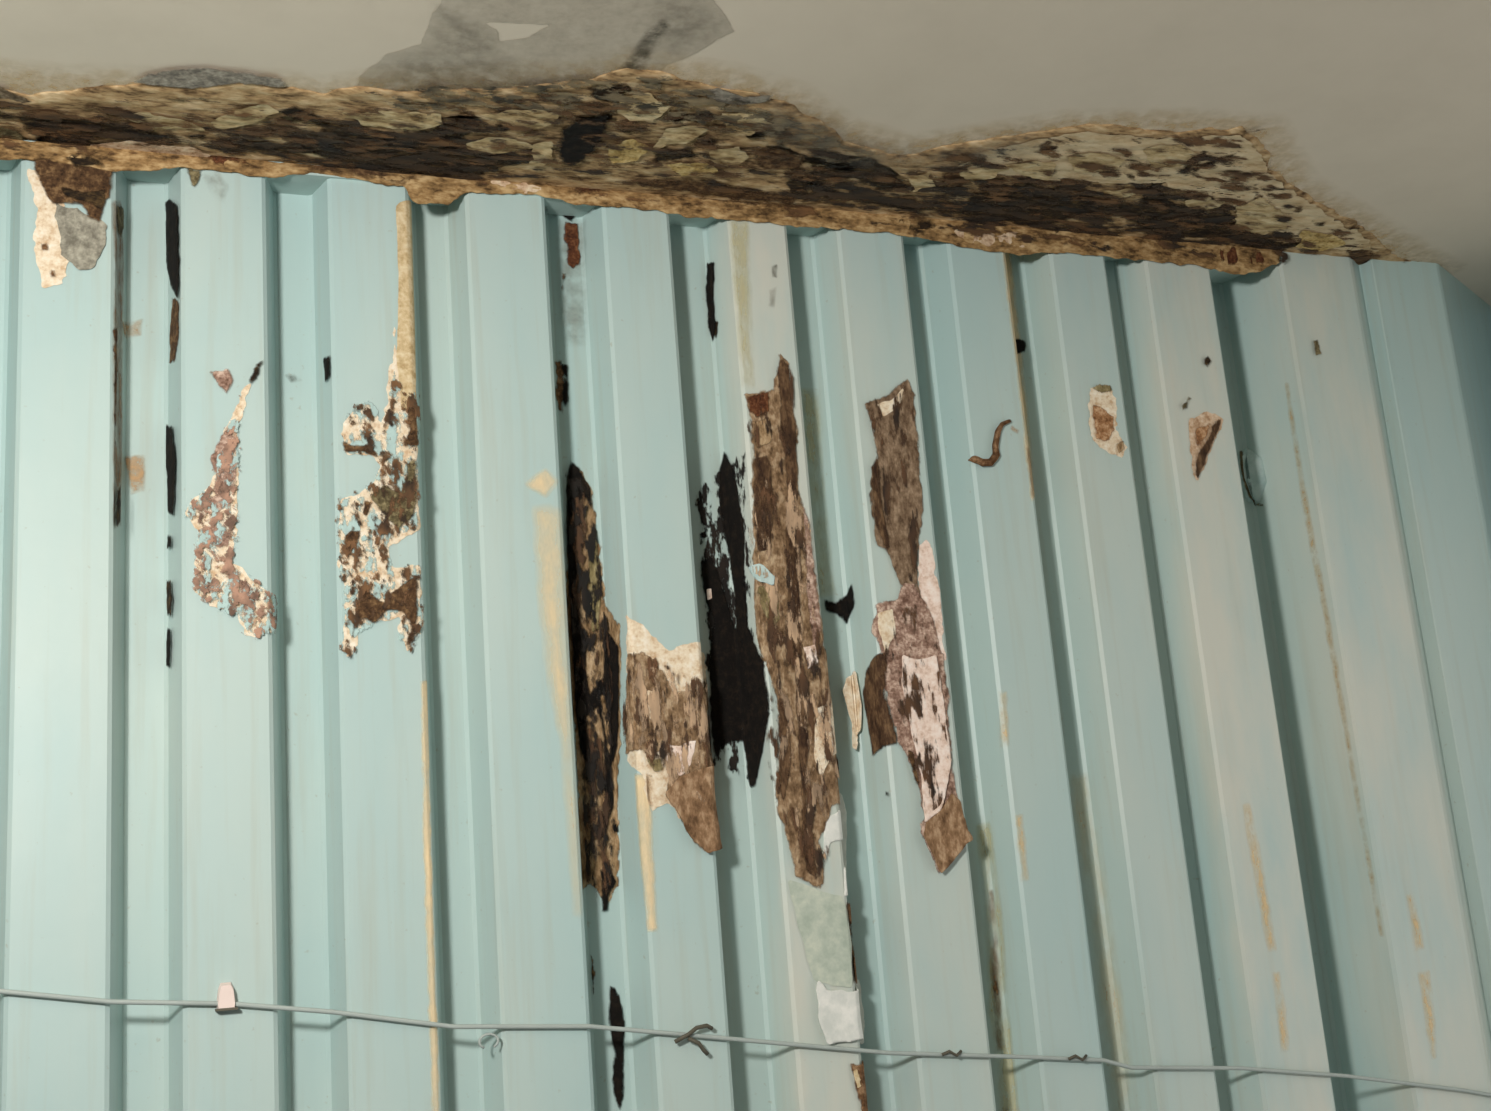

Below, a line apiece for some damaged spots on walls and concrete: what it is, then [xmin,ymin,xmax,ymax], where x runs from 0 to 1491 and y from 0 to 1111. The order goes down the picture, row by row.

spalling [0,0,1411,288]
peeling [184,361,277,638]
peeling [335,200,424,658]
peeling [1088,384,1128,458]
peeling [1182,398,1223,480]
peeling [622,615,723,853]
peeling [744,354,973,1045]